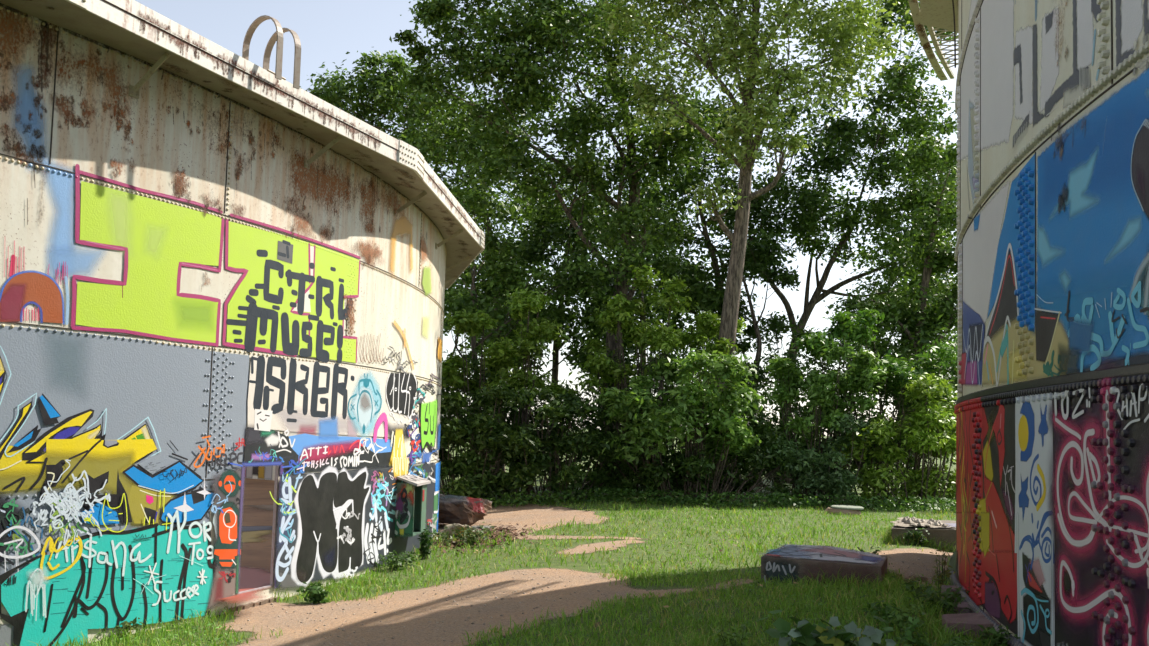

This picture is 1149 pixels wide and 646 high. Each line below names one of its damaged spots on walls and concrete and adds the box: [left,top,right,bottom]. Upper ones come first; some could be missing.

corrosion [0,7,135,178]
corrosion [139,12,414,335]
corrosion [419,175,480,252]